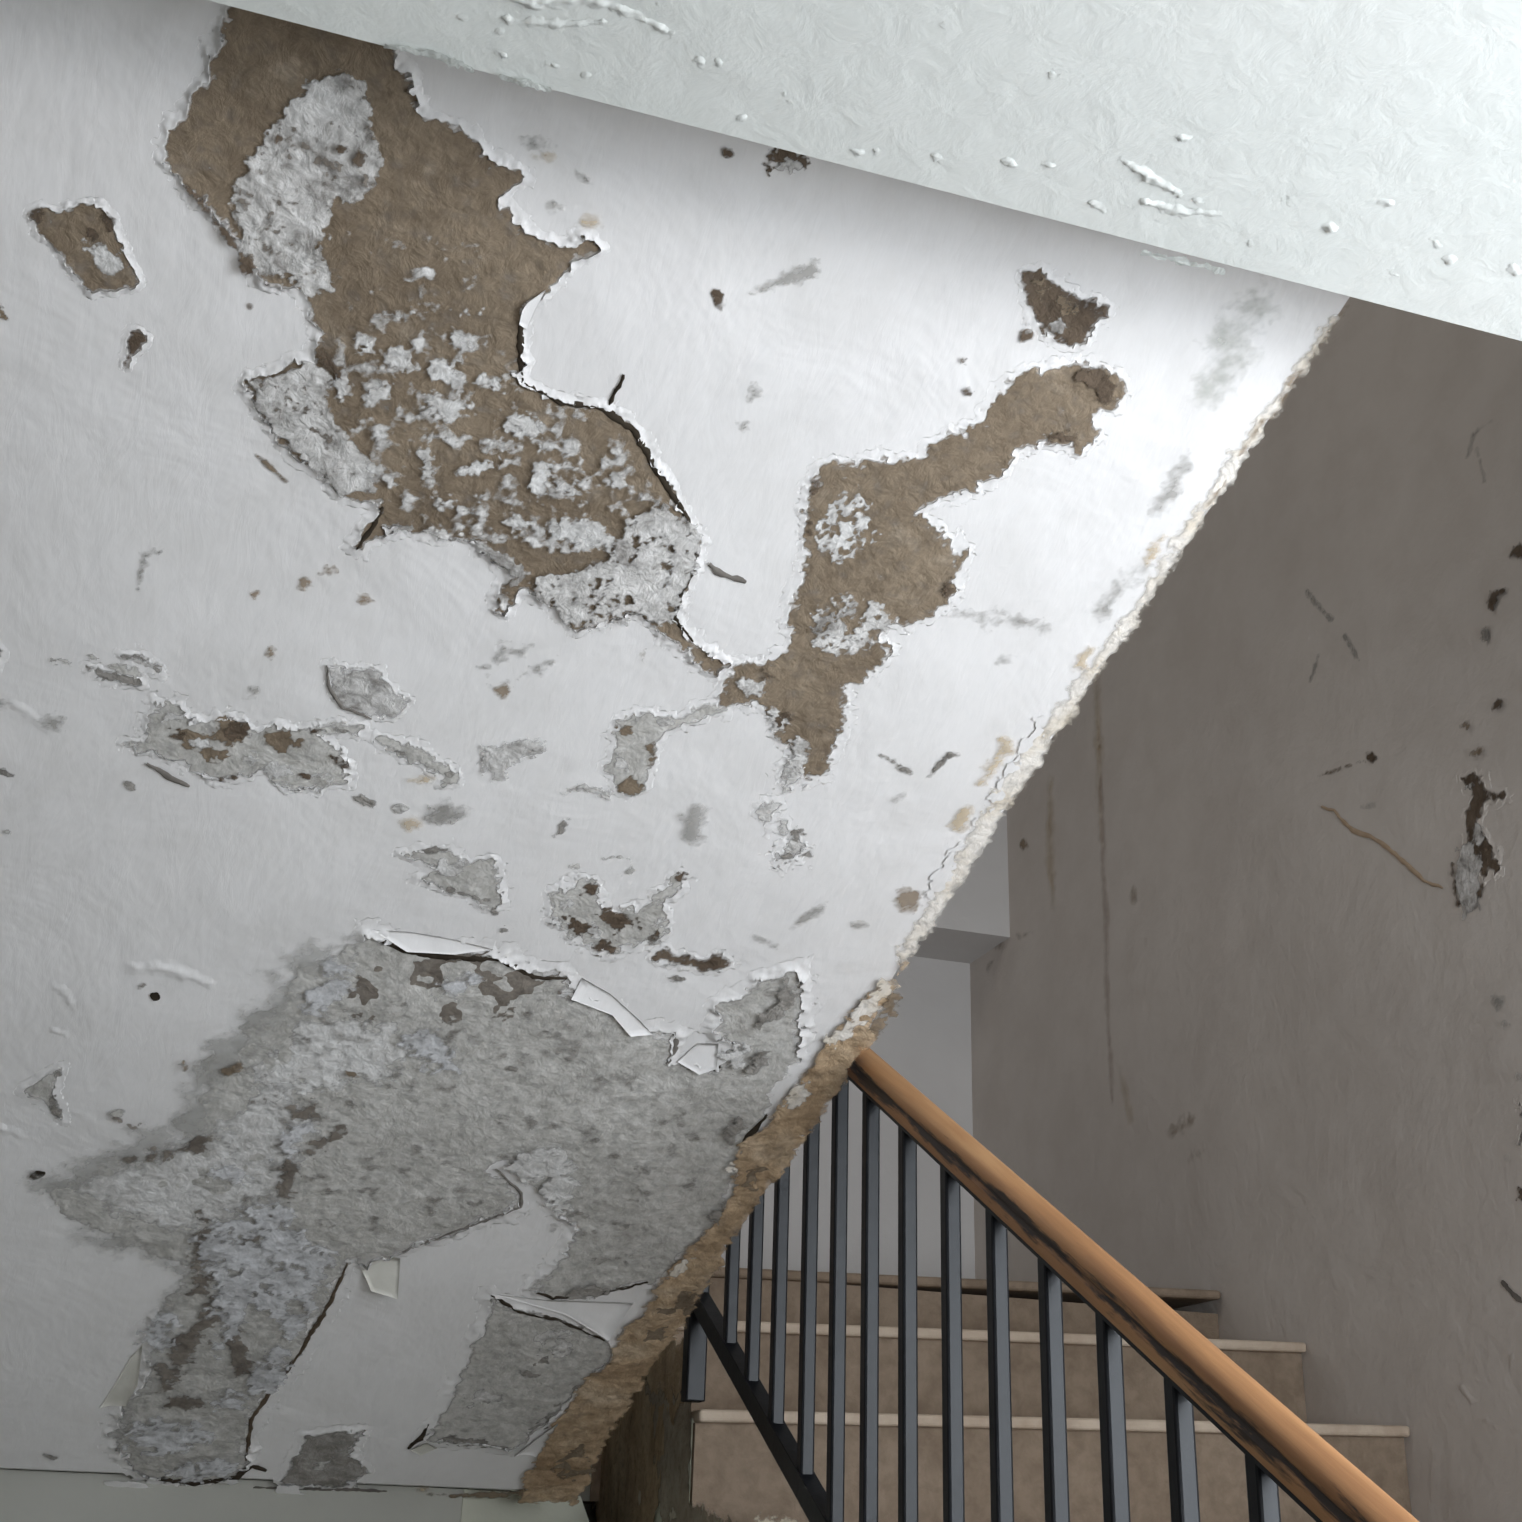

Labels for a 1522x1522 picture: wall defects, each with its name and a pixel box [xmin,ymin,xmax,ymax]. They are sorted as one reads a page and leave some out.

peeling [22,196,147,301]
peeling [150,3,1135,878]
peeling [1509,543,1522,558]
peeling [0,640,10,673]
peeling [1481,588,1505,641]
peeling [1451,748,1514,920]
peeling [13,1060,71,1127]
spalling [29,643,909,1522]